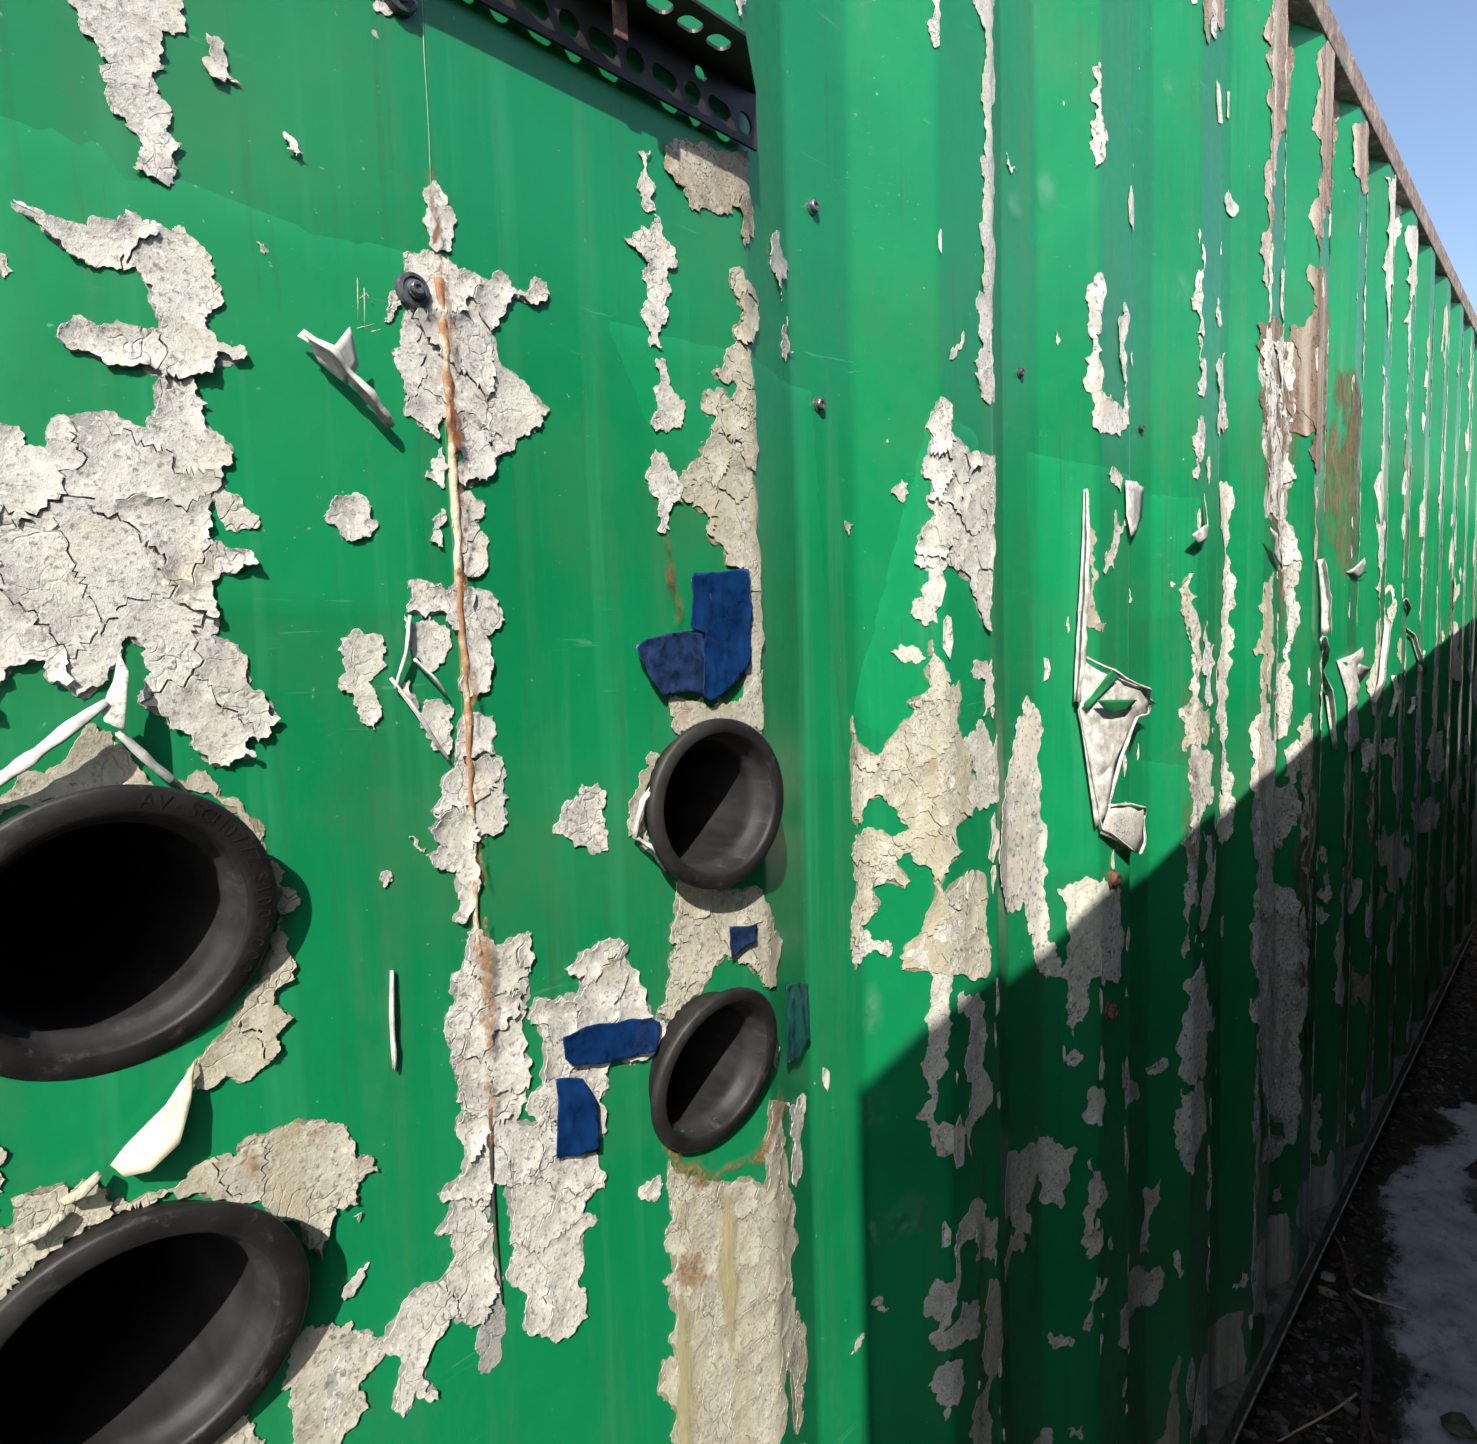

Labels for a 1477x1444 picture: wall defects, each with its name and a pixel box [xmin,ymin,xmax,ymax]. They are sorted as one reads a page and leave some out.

peeling [67,0,186,187]
rust [429,171,439,243]
rust [439,265,454,352]
peeling [1382,174,1418,342]
rust [448,371,462,460]
rust [1256,264,1363,617]
peeling [0,200,301,1090]
rust [457,526,468,592]
peeling [281,138,808,1444]
peeling [850,396,1125,1156]
rust [475,917,496,1053]
peeling [0,1118,378,1300]